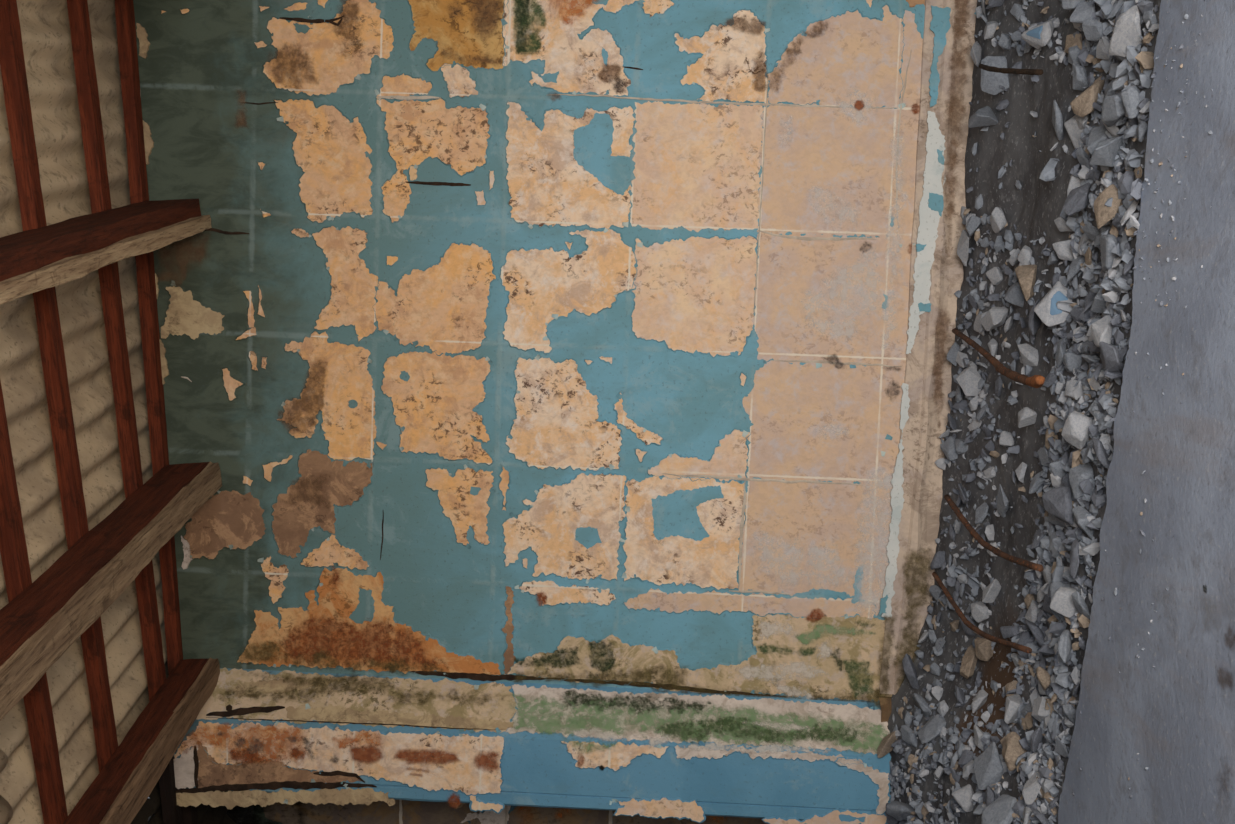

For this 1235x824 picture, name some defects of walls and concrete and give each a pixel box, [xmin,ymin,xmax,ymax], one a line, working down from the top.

crack [279,16,344,26]
damp [451,0,546,54]
crack [405,179,471,187]
peeling [155,273,268,402]
peeling [173,0,925,824]
corrosion [281,618,443,671]
damp [502,554,931,753]
crack [206,704,490,730]
corrosion [338,732,457,771]
corrosion [475,754,498,769]